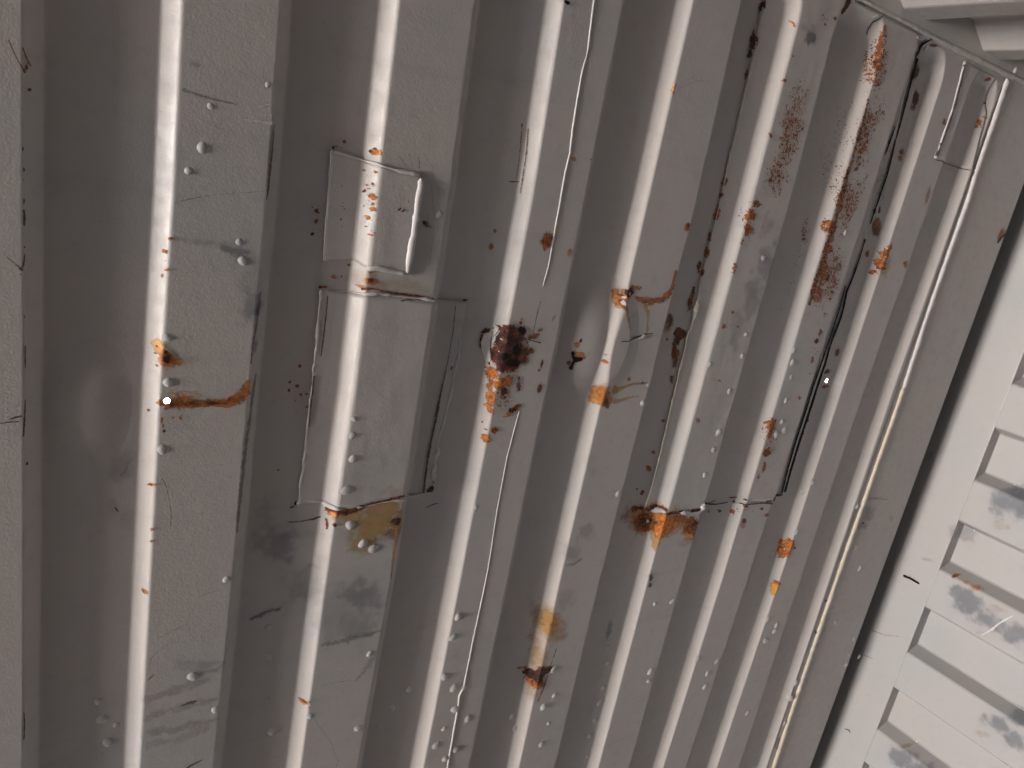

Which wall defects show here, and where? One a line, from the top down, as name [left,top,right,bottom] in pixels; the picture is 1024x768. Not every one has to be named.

rust [738,72,810,246]
rust [798,25,892,317]
rust [362,169,377,236]
rust [611,270,677,332]
crack [705,47,922,517]
rust [151,339,182,367]
rust [665,314,687,384]
rust [147,380,250,433]
rust [589,377,647,408]
rust [622,488,701,550]
rust [777,537,796,558]
rust [517,648,557,702]